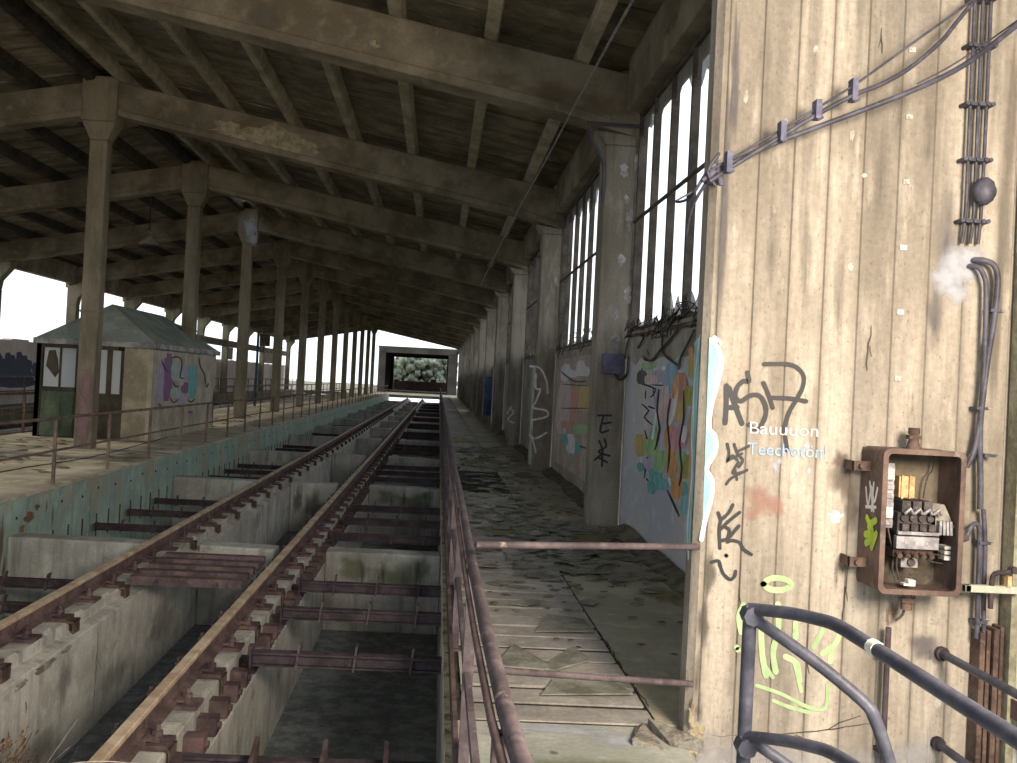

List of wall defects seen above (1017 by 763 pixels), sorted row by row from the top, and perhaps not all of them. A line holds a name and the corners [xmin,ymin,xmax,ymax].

crack [588,619,649,706]